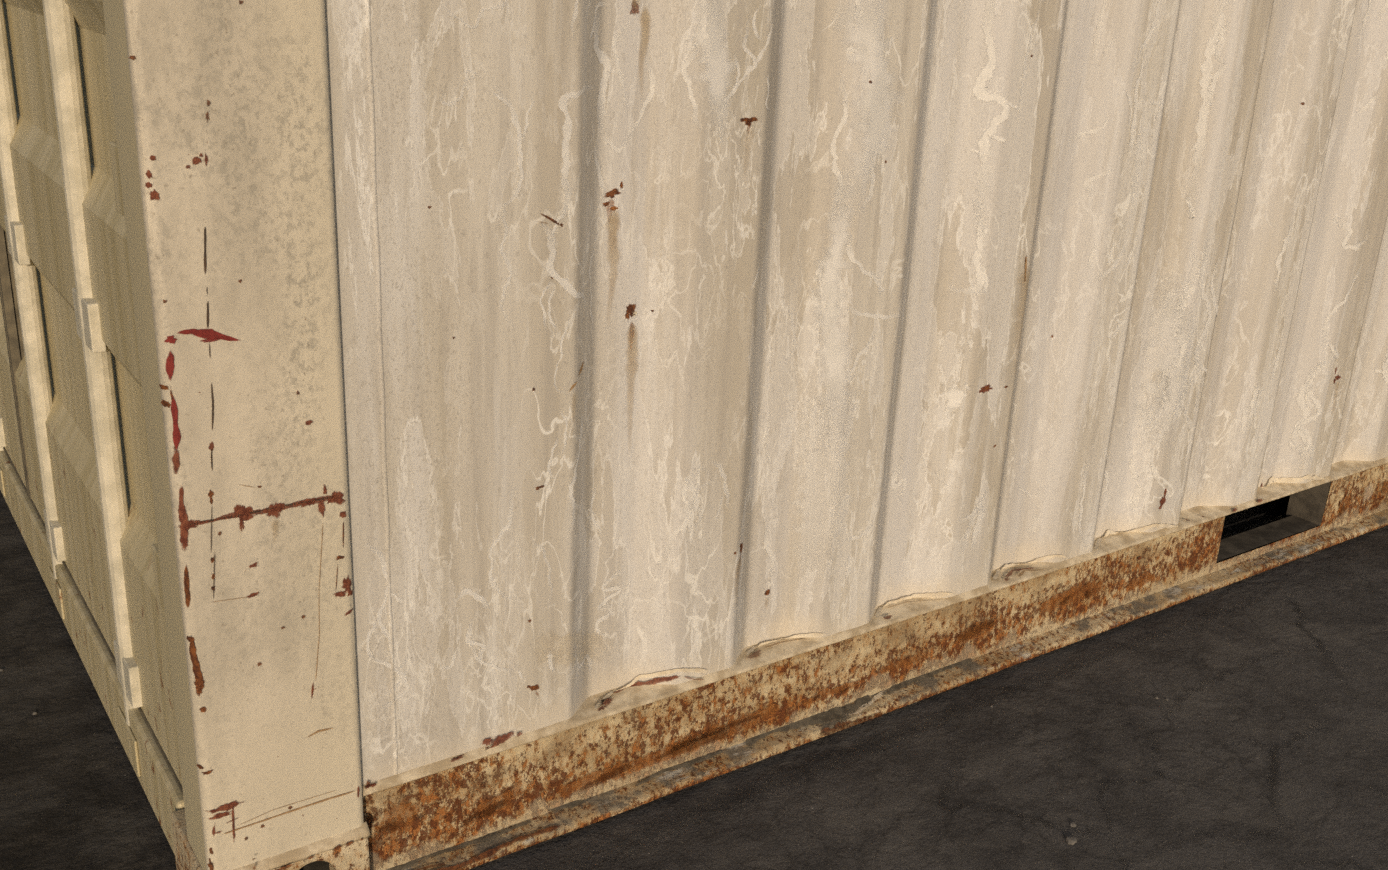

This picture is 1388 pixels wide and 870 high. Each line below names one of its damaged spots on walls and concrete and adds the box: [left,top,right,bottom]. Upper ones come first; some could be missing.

rust [630,0,648,30]
rust [186,153,208,169]
rust [145,155,159,200]
rust [603,182,623,239]
rust [625,304,654,319]
rust [1340,495,1352,516]
rust [1041,580,1103,612]
rust [803,680,863,705]
rust [334,783,527,851]
rust [437,825,560,870]